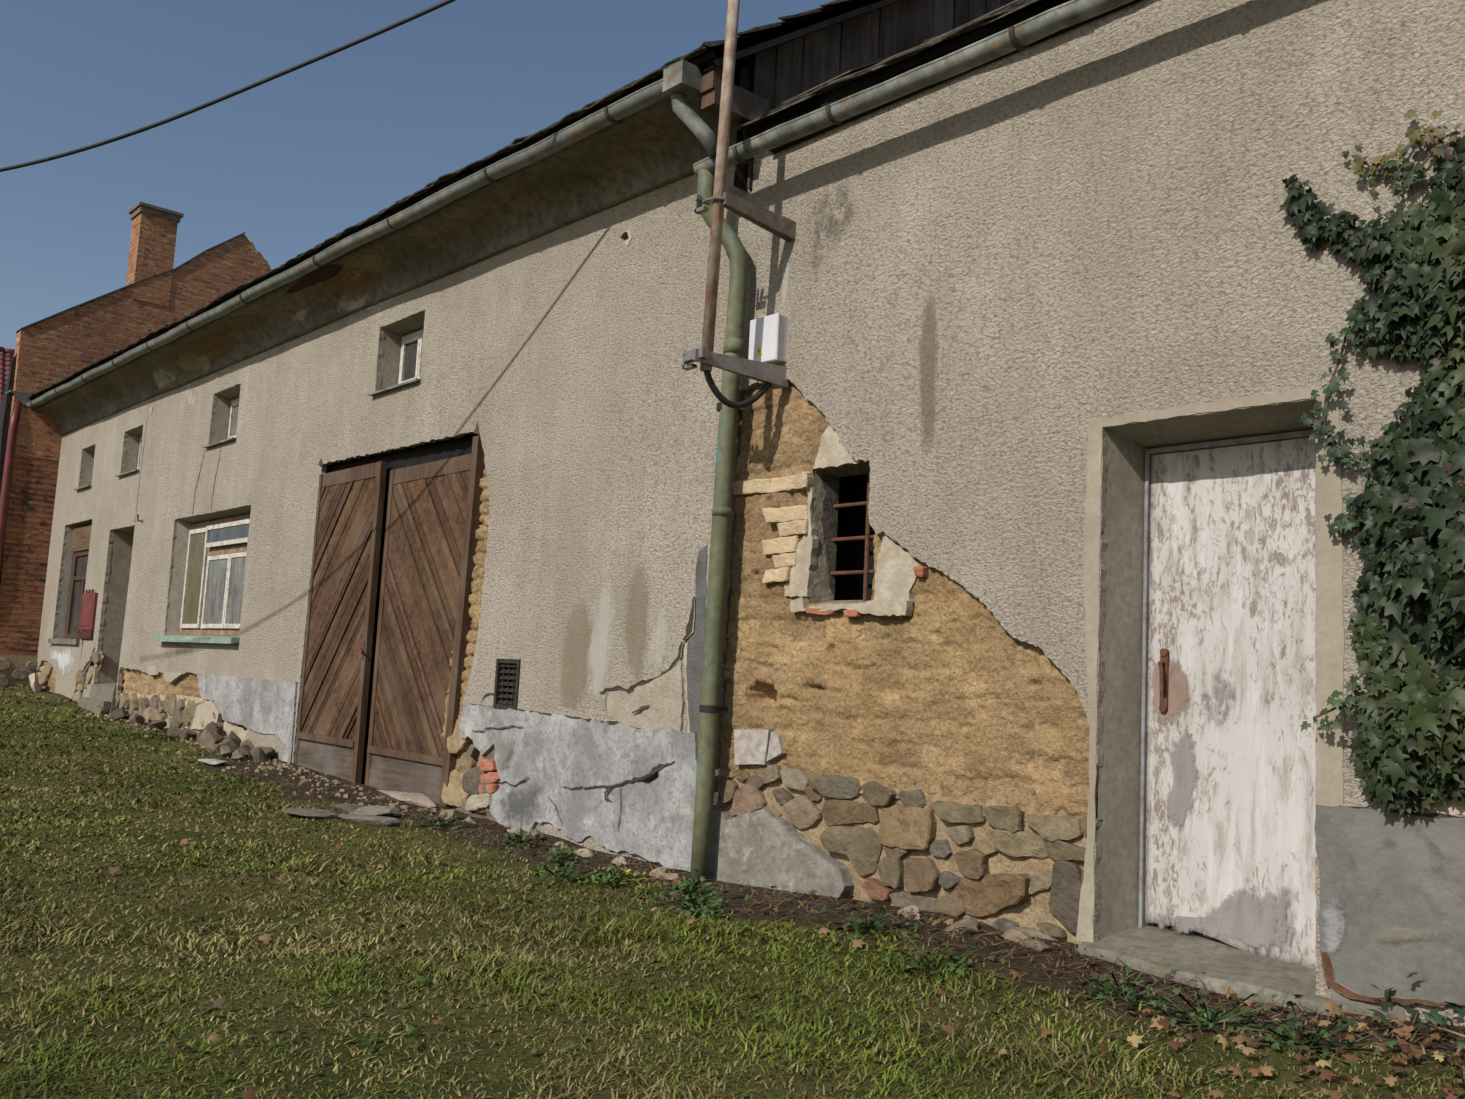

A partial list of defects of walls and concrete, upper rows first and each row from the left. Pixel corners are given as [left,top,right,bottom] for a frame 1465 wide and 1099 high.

water stain [920,304,935,435]
spalling [116,665,247,742]
spalling [441,456,500,822]
water stain [563,610,588,706]
crack [470,596,695,732]
water stain [626,572,646,674]
spalling [709,381,1104,945]